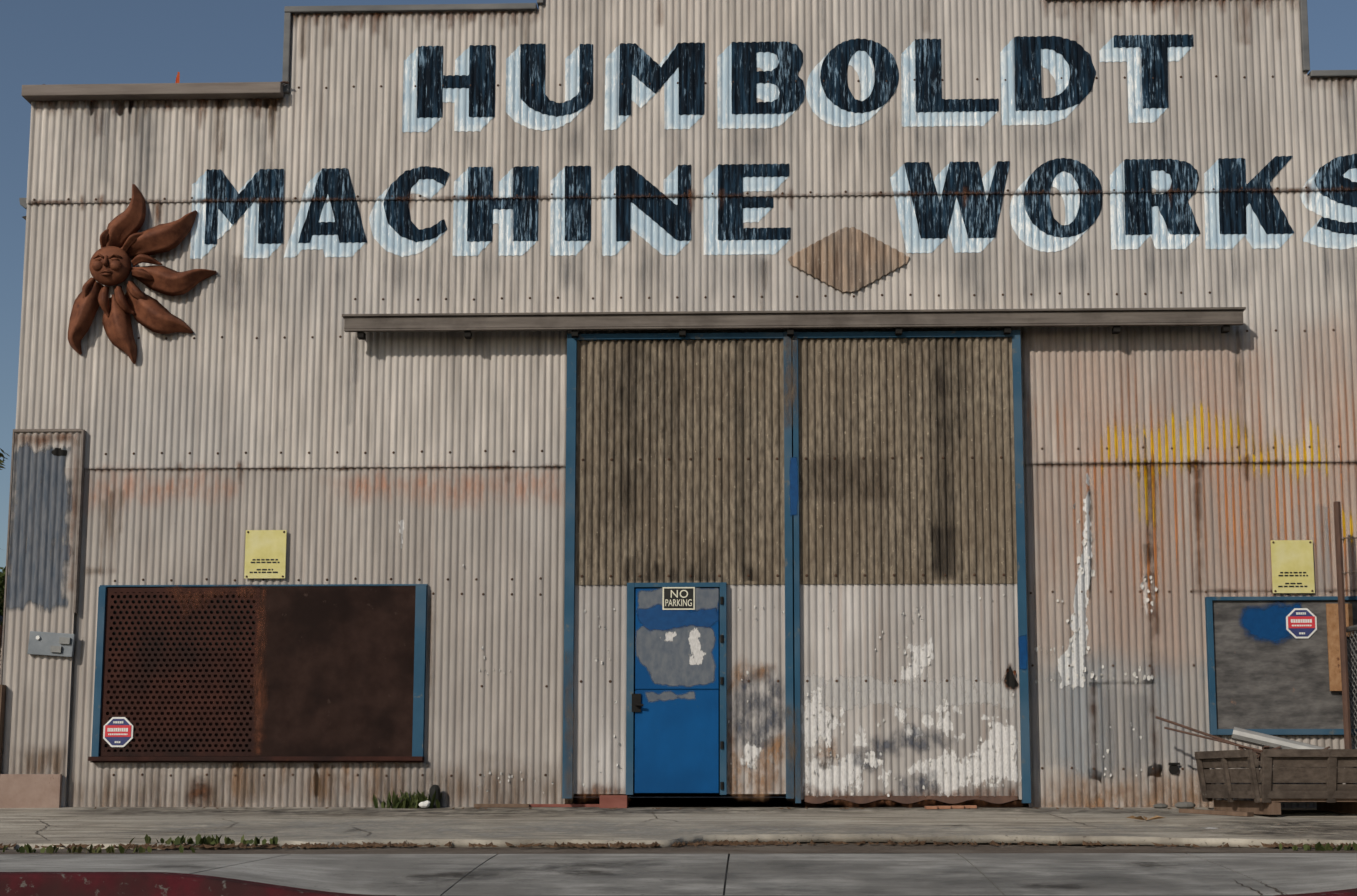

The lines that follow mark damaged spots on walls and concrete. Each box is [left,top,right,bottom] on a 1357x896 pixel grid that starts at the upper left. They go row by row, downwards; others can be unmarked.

rust [727,711,796,795]
peeling [800,606,1021,797]
peeling [1034,473,1159,777]